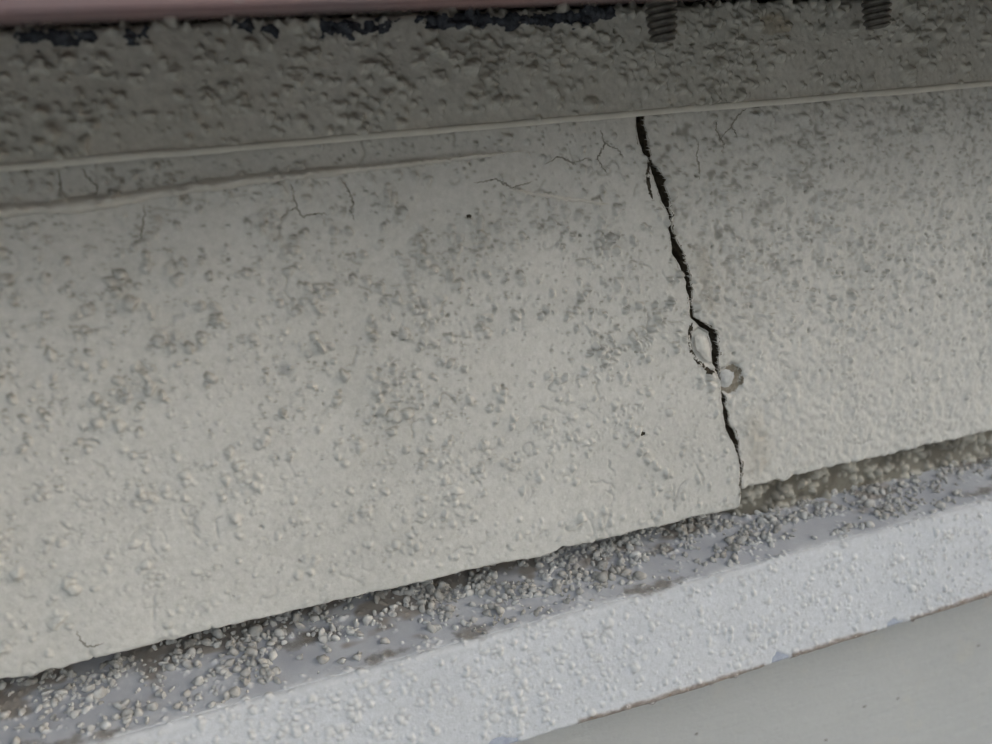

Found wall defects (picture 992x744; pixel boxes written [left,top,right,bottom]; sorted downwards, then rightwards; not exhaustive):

crack [474,116,744,497]
crack [696,108,747,180]